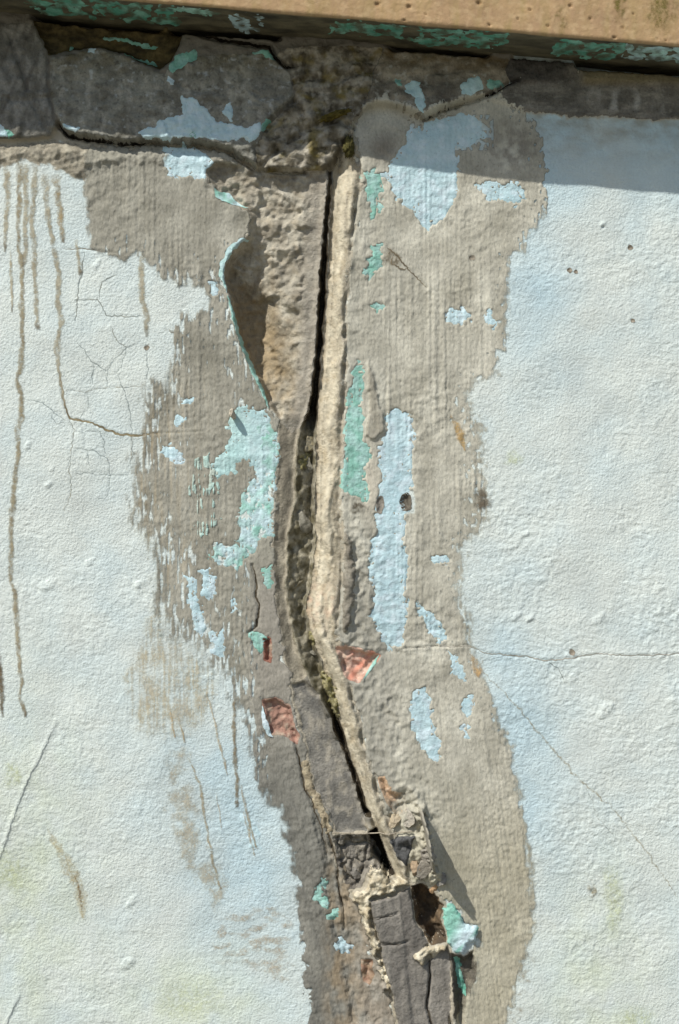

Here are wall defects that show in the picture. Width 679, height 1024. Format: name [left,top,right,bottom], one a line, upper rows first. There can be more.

crack [59,124,146,147]
peeling [550,39,679,64]
leakage [3,163,82,717]
crack [34,248,188,510]
peeling [0,19,549,1024]
crack [249,131,410,928]
leakage [128,616,256,854]
leakage [171,754,225,900]
crack [403,645,679,683]